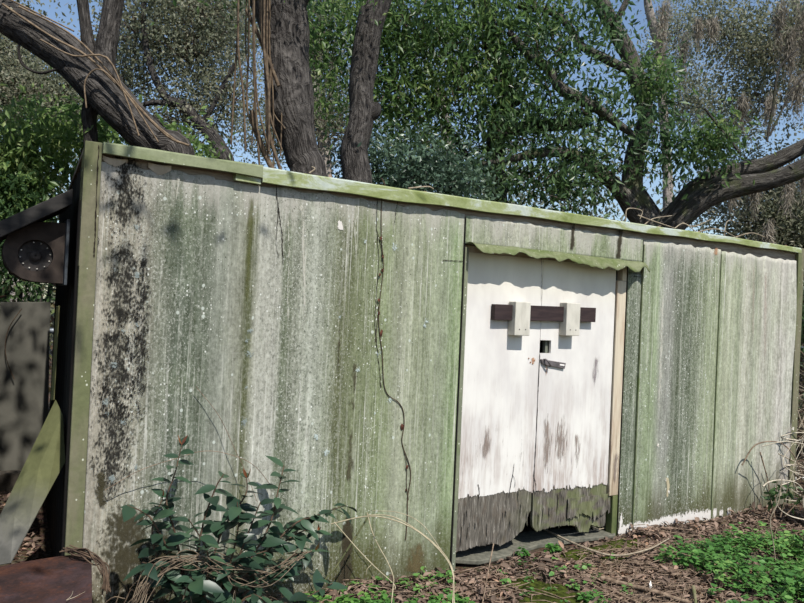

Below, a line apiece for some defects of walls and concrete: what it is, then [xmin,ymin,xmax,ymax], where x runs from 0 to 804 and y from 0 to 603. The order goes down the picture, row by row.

water stain [89,156,177,603]
crack [375,201,398,385]
water stain [544,420,581,472]